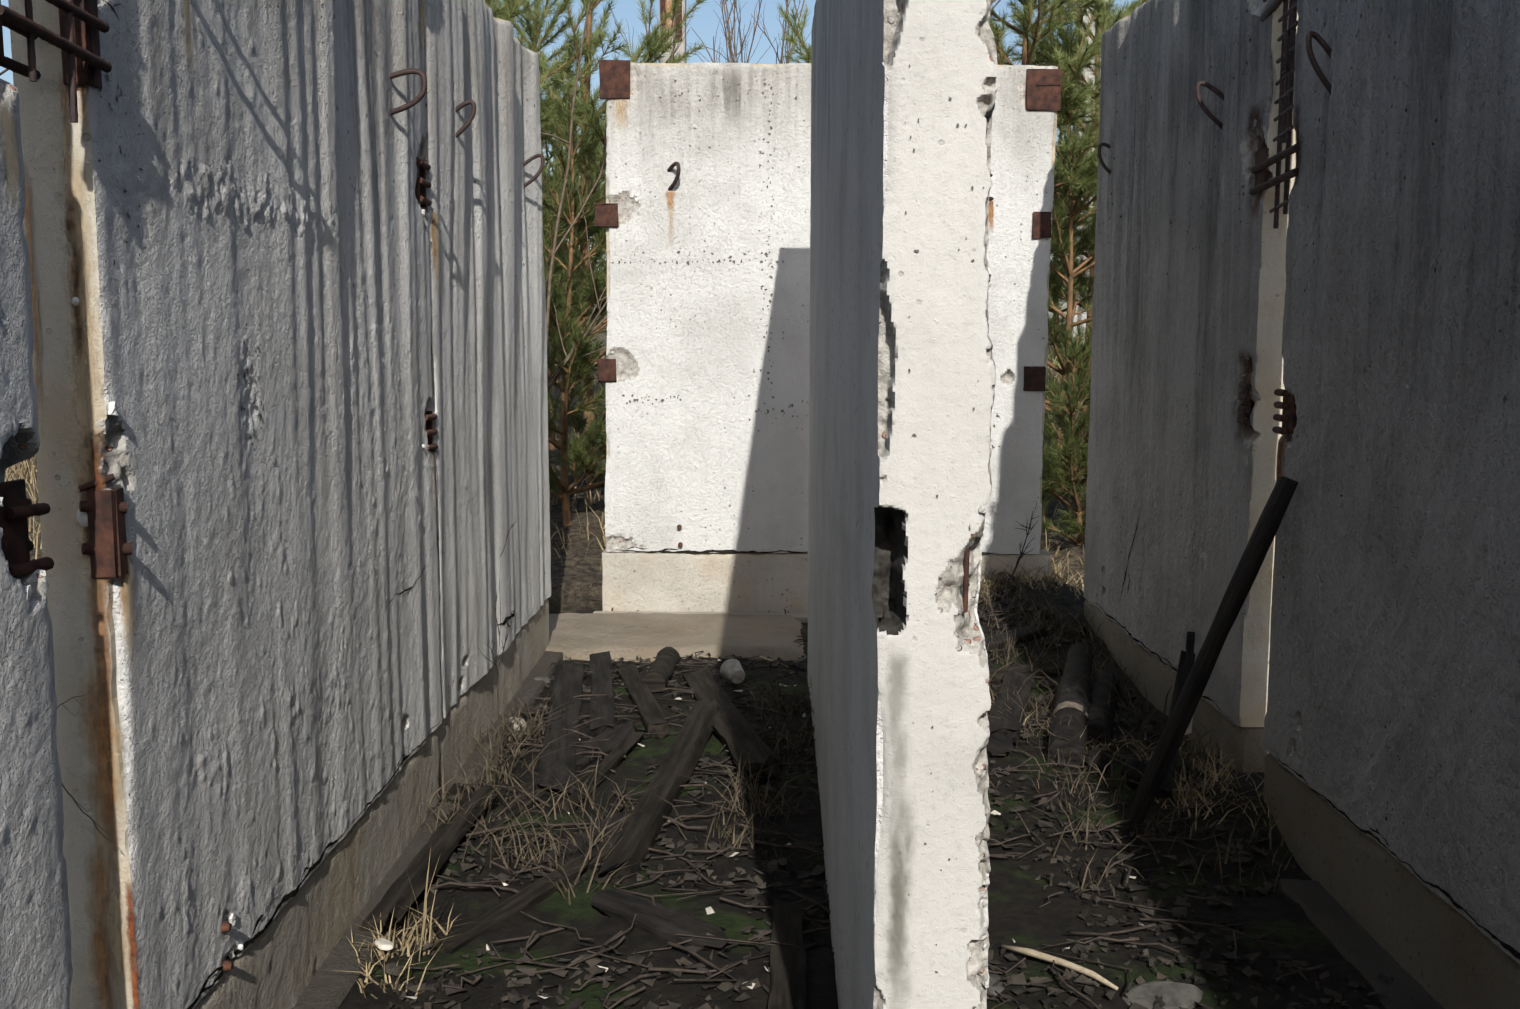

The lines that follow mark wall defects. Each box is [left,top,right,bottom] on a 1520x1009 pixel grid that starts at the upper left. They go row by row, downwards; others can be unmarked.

spalling [630,62,642,96]
spalling [0,414,39,506]
rust [62,81,103,501]
spalling [606,71,803,421]
spalling [878,261,911,458]
spalling [973,290,1015,490]
rust [121,555,133,634]
crack [384,567,426,611]
spalling [872,506,908,635]
spalling [935,506,989,685]
rust [87,577,139,1009]
spalling [972,711,991,907]